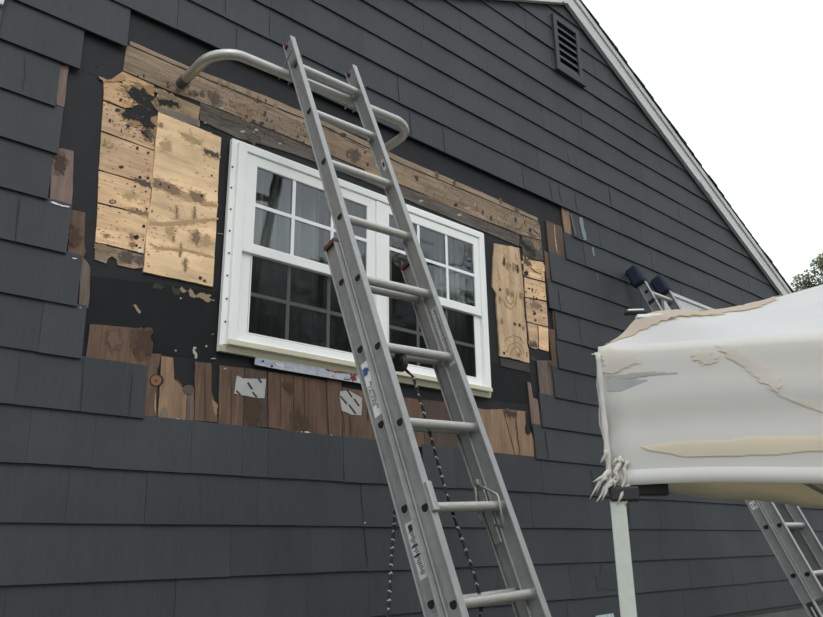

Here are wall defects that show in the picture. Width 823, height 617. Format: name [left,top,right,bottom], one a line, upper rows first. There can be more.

peeling [98,74,126,83]
damp [94,46,312,273]
peeling [153,283,214,302]